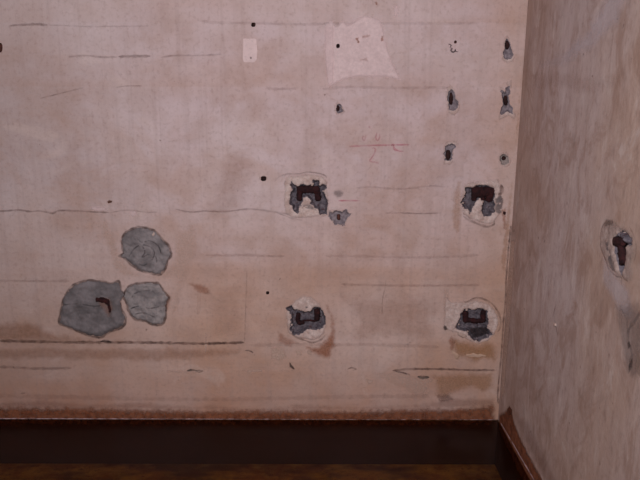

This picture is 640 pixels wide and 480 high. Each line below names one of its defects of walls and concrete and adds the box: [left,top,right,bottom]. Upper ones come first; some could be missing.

spalling [503,36,514,62]
spalling [447,87,459,114]
spalling [500,81,516,119]
spalling [443,142,456,164]
spalling [284,175,351,226]
spalling [460,179,506,223]
spalling [600,220,633,280]
spalling [286,297,326,340]
spalling [444,299,498,343]